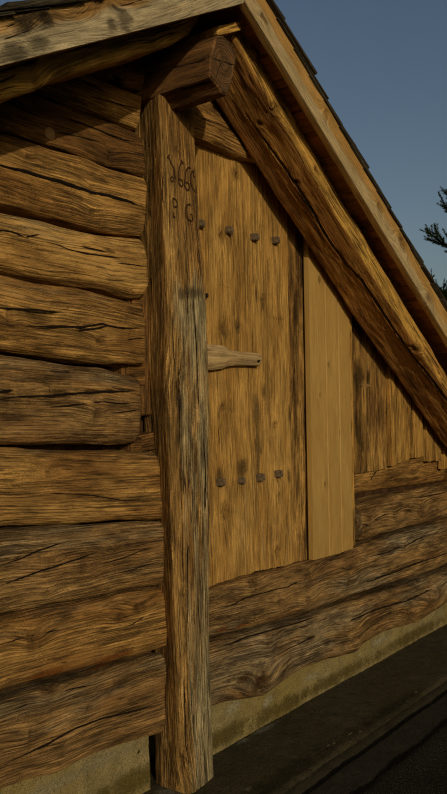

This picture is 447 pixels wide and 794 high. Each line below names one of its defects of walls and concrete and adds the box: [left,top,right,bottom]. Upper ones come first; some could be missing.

crack [0,307,146,340]
crack [3,706,152,766]